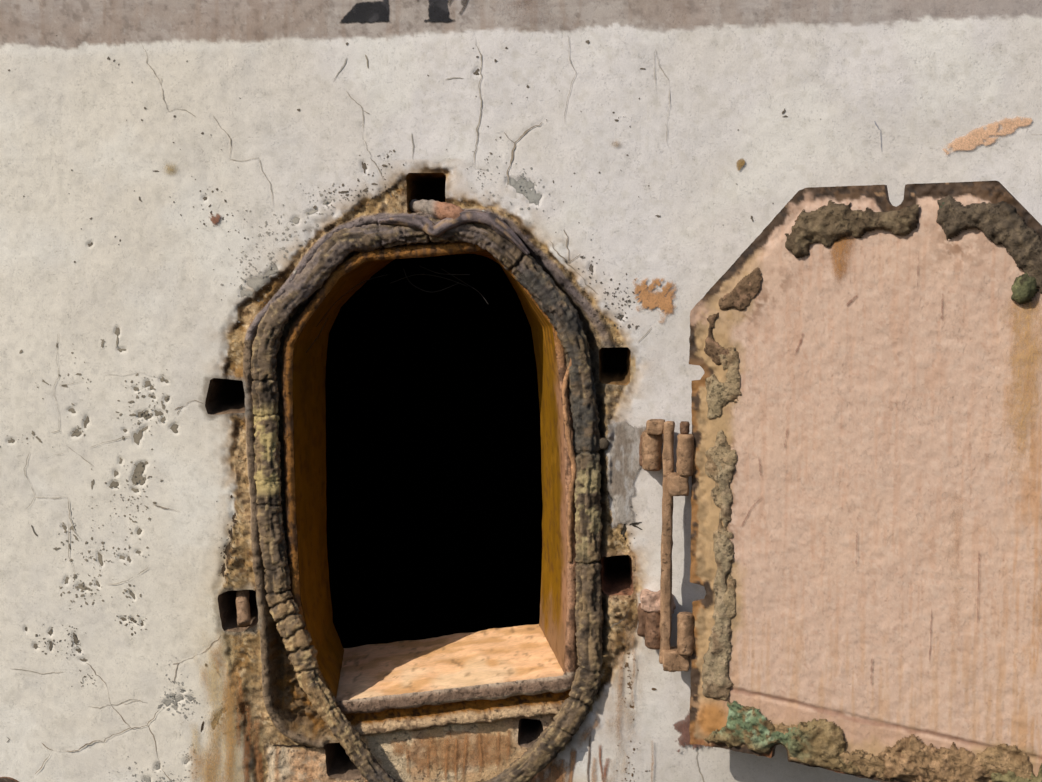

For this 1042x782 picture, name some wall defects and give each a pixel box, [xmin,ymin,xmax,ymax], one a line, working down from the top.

crack [142,45,273,201]
crack [347,92,383,178]
crack [474,36,576,188]
peeling [564,256,676,340]
corrosion [832,237,851,278]
peeling [116,369,178,445]
peeling [53,449,163,636]
peeling [25,624,95,687]
crack [35,635,221,780]
corrosion [193,640,263,782]
corrosion [530,720,608,782]
corrosion [674,712,713,752]